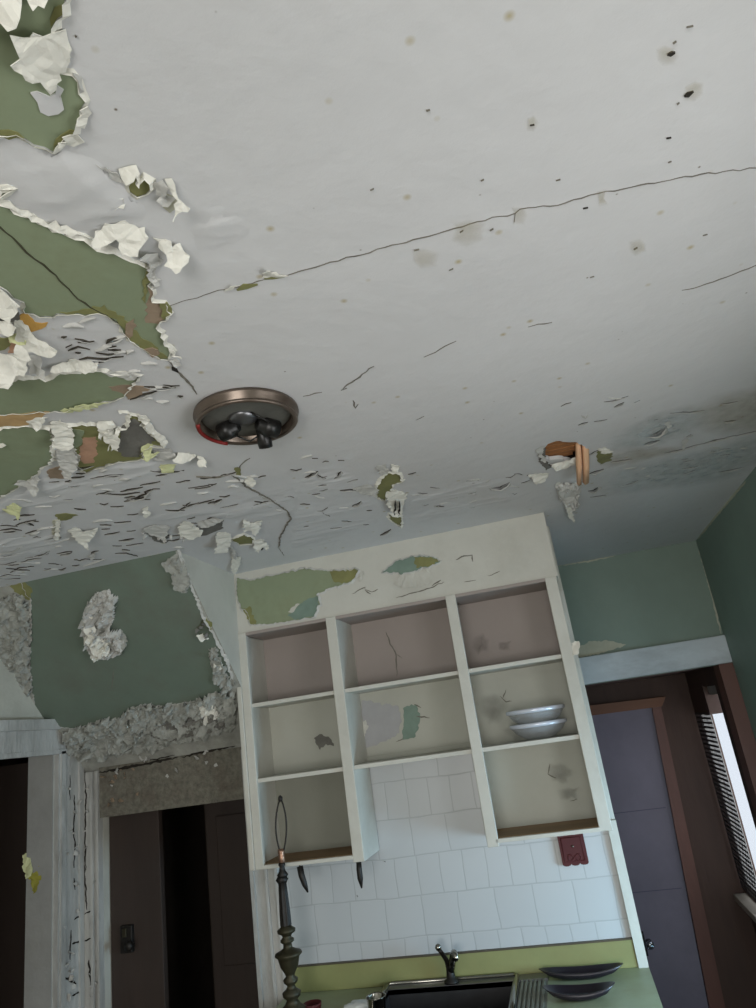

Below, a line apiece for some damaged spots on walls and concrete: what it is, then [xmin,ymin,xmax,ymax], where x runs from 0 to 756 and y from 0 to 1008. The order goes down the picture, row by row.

peeling [0,0,92,155]
peeling [96,165,190,222]
crack [170,167,756,306]
peeling [0,184,207,520]
crack [196,458,292,555]
peeling [352,464,408,528]
peeling [528,445,583,523]
peeling [596,447,613,464]
peeling [381,554,442,598]
peeling [0,506,378,763]
crack [62,746,235,1002]